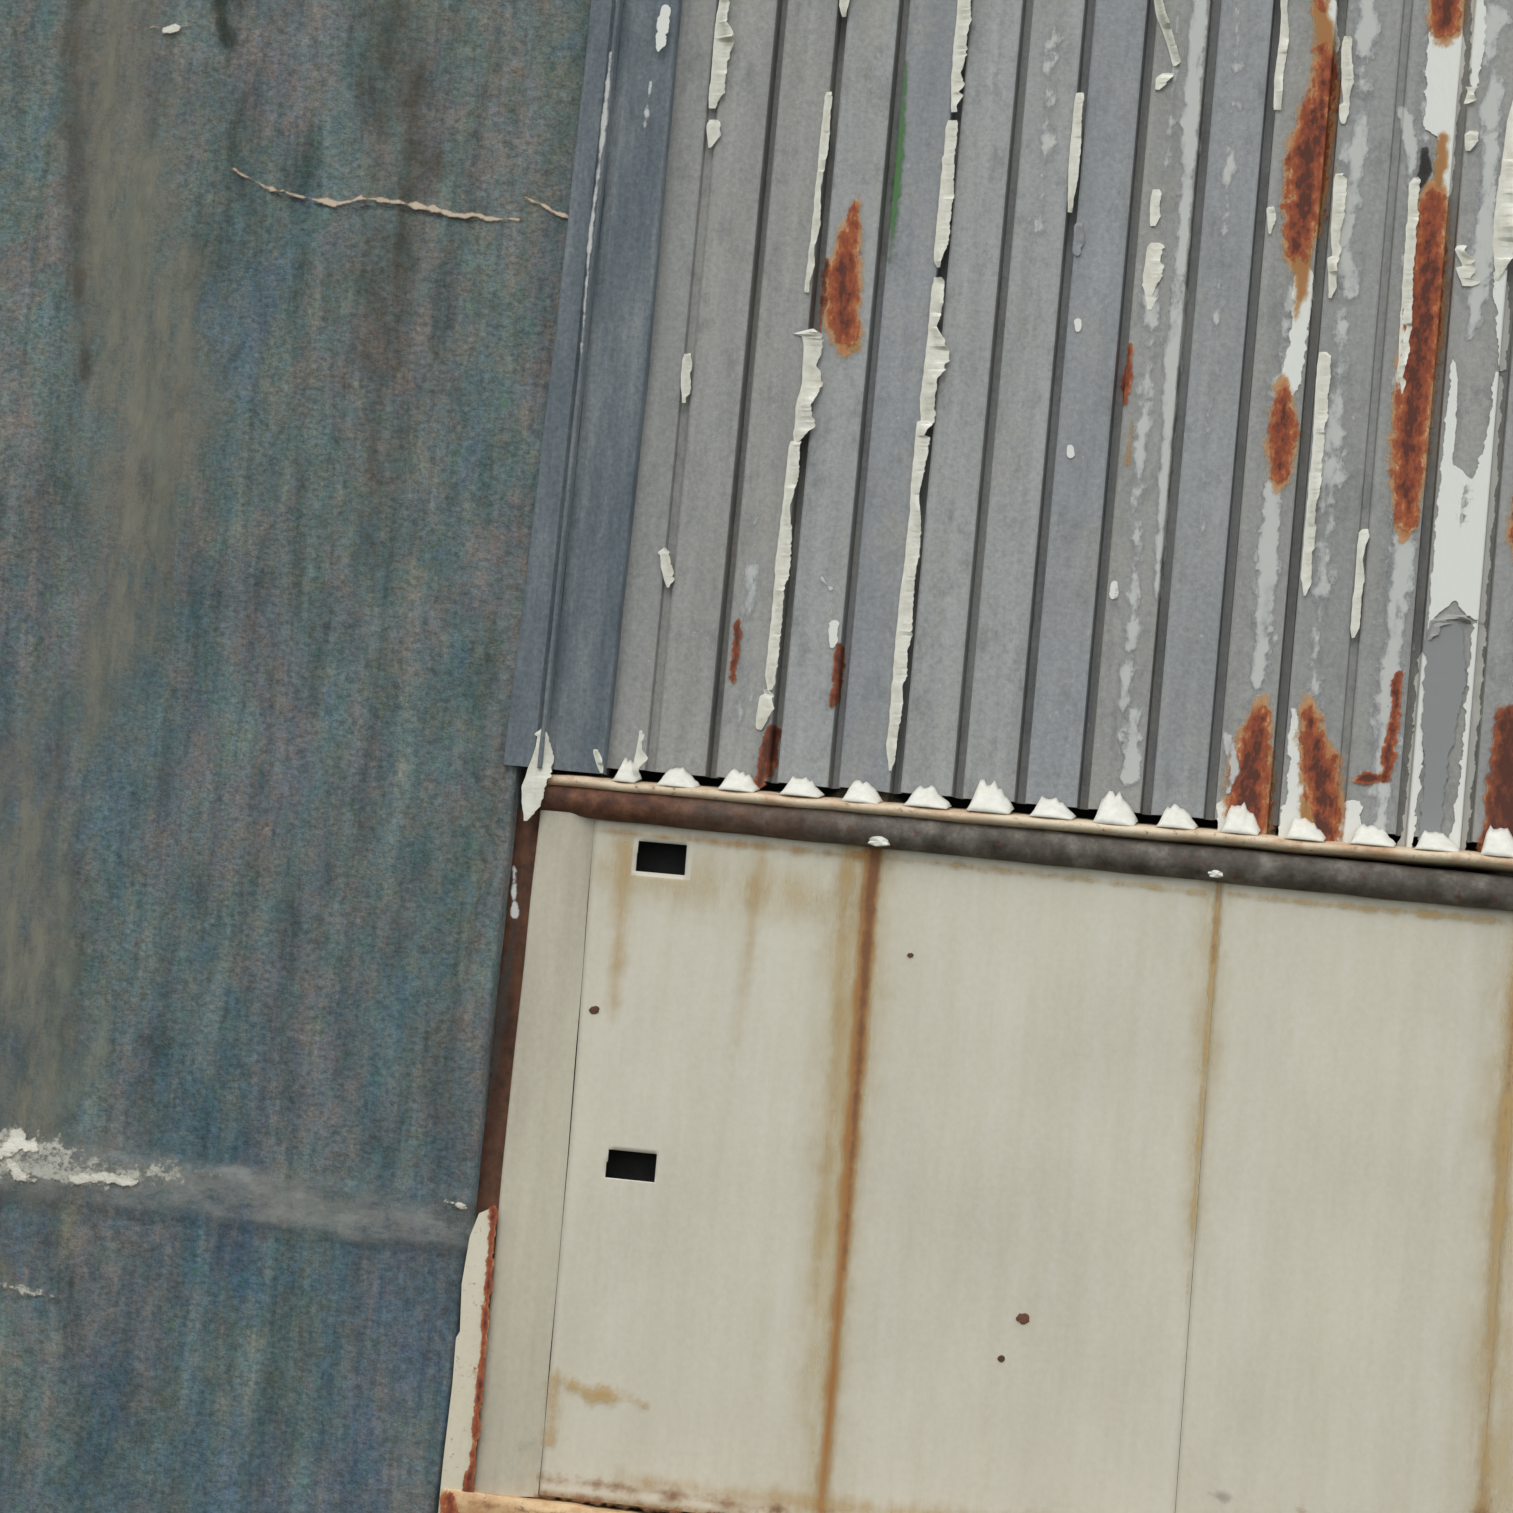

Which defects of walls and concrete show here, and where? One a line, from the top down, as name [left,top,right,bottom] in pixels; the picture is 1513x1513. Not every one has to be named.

crack [232,167,568,222]
peeling [735,329,824,730]
peeling [804,92,833,293]
peeling [886,0,972,771]
rust [1280,0,1341,317]
peeling [1266,0,1381,837]
rust [1387,133,1450,544]
peeling [1336,0,1513,850]
rust [1222,693,1276,835]
rust [1477,704,1513,851]
rust [439,1205,498,1513]
rust [806,847,882,1513]